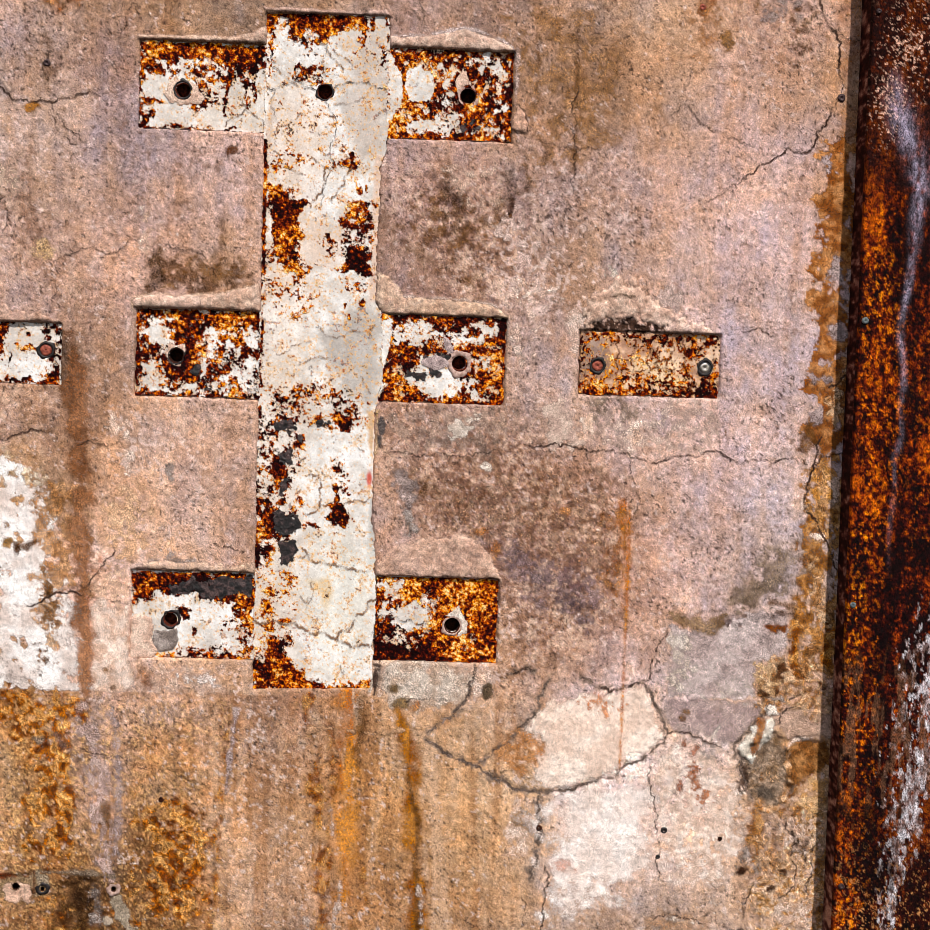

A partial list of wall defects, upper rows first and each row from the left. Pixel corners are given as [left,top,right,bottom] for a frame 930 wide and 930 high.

crack [677,0,844,200]
rust [0,322,62,385]
rust [578,330,721,399]
peeling [0,411,224,697]
rust [123,5,625,930]
rust [0,682,92,872]
crack [406,632,802,930]
crack [768,823,817,898]